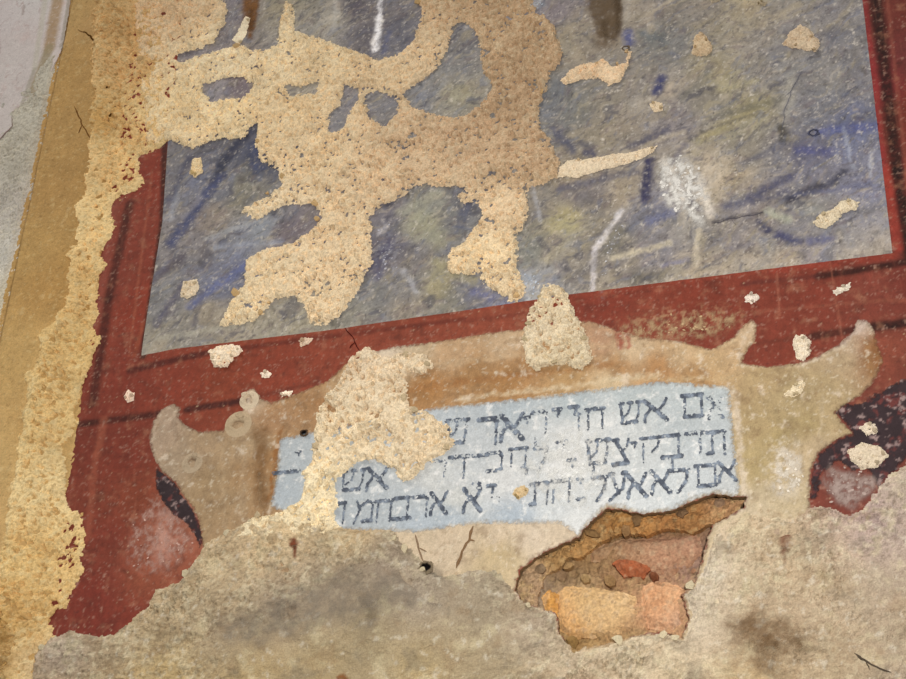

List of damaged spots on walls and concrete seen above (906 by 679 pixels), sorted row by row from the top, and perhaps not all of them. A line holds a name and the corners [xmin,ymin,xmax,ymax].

flaking render [0,0,657,679]
flaking render [32,347,906,679]